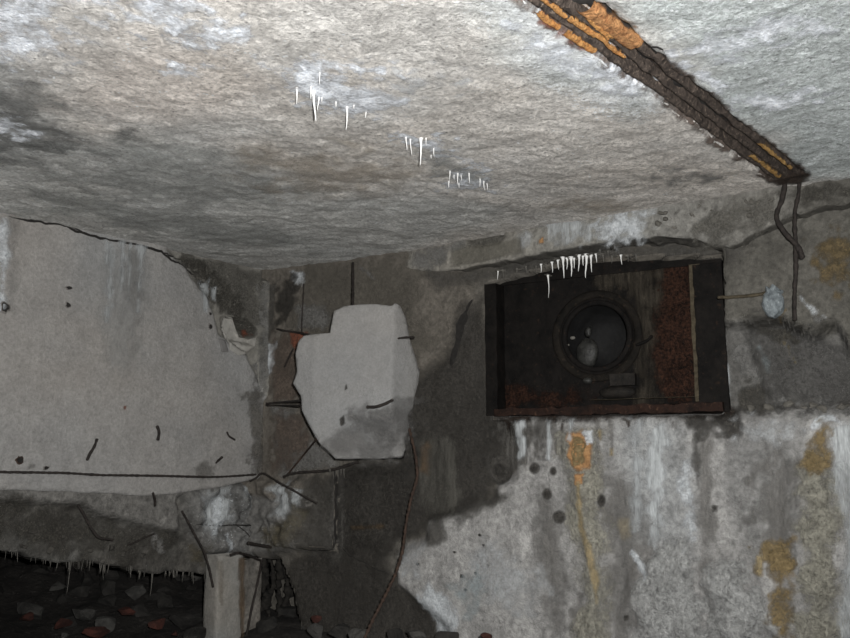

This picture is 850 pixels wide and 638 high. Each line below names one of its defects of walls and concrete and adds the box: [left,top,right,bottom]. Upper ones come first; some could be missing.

damp [282,60,410,128]
corrosion [512,0,810,185]
damp [388,132,495,194]
crack [9,216,196,277]
damp [430,212,734,298]
spalling [181,510,214,587]
corrosion [498,409,739,592]
damp [598,428,669,637]
damp [678,410,743,538]
corrosion [754,536,797,636]
corrosion [800,426,832,475]
damp [811,415,850,532]